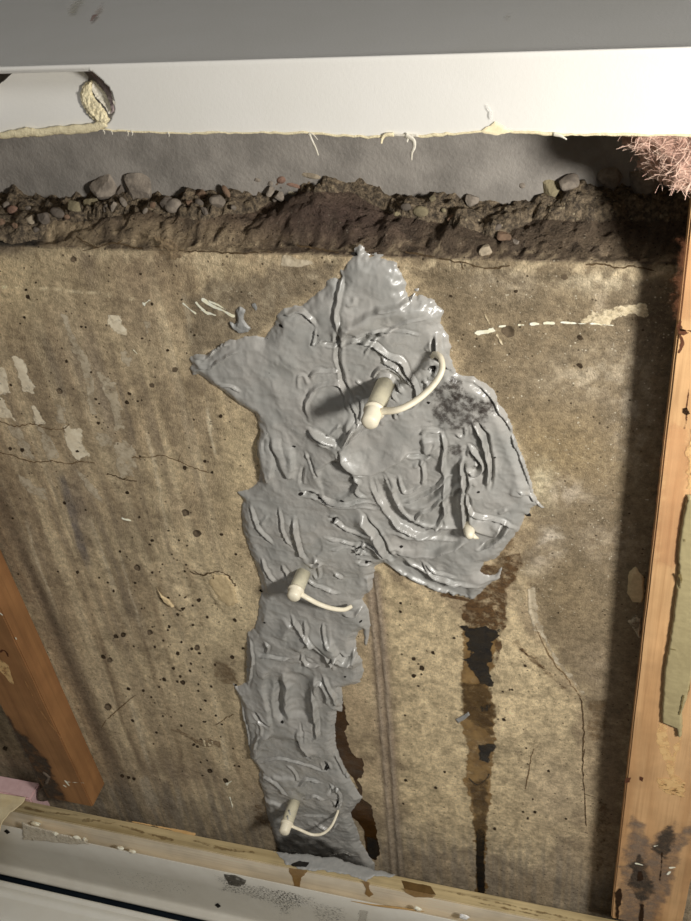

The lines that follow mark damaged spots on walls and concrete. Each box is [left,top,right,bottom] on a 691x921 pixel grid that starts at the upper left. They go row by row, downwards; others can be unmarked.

spalling [0,71,115,139]
peeling [0,356,35,421]
peeling [31,405,90,461]
leakage [277,698,380,866]
leakage [460,626,500,894]
crack [535,625,593,826]
leakage [289,868,308,887]
leakage [619,822,691,921]